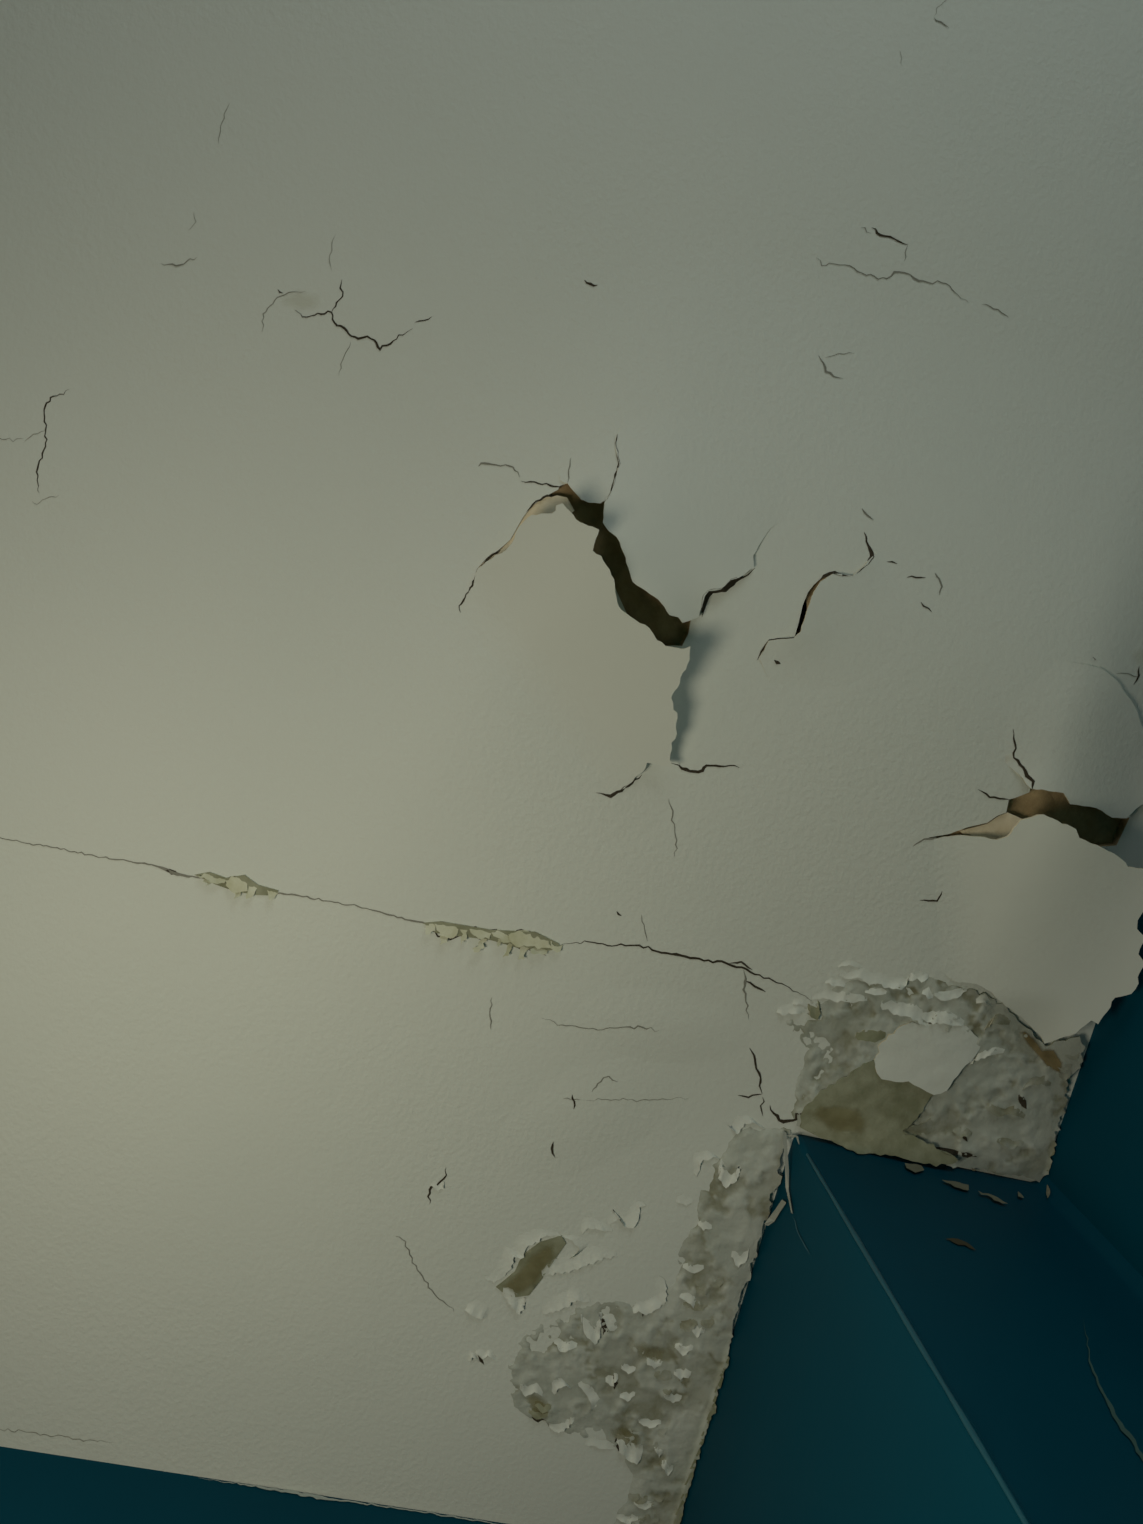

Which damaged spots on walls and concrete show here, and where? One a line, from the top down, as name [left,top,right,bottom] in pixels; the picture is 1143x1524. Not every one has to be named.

crack [262,236,431,370]
crack [816,227,1008,317]
crack [0,389,69,505]
crack [757,509,943,689]
crack [0,837,200,879]
peeling [196,872,279,900]
crack [278,892,425,924]
peeling [424,921,563,960]
flaking render [465,959,1085,1524]